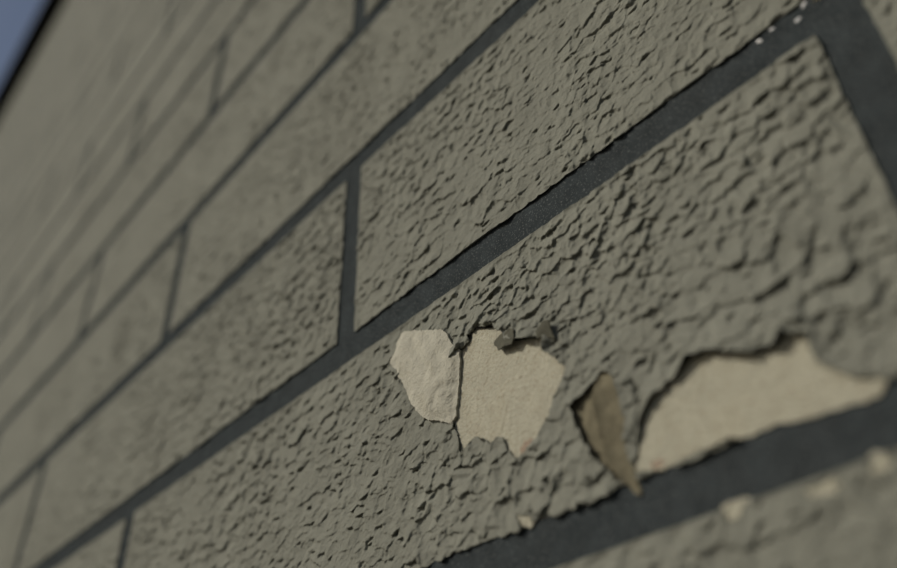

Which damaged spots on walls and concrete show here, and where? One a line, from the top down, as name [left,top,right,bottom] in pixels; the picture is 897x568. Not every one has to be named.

peeling [390,320,565,458]
peeling [571,332,888,497]
spalling [866,451,893,475]